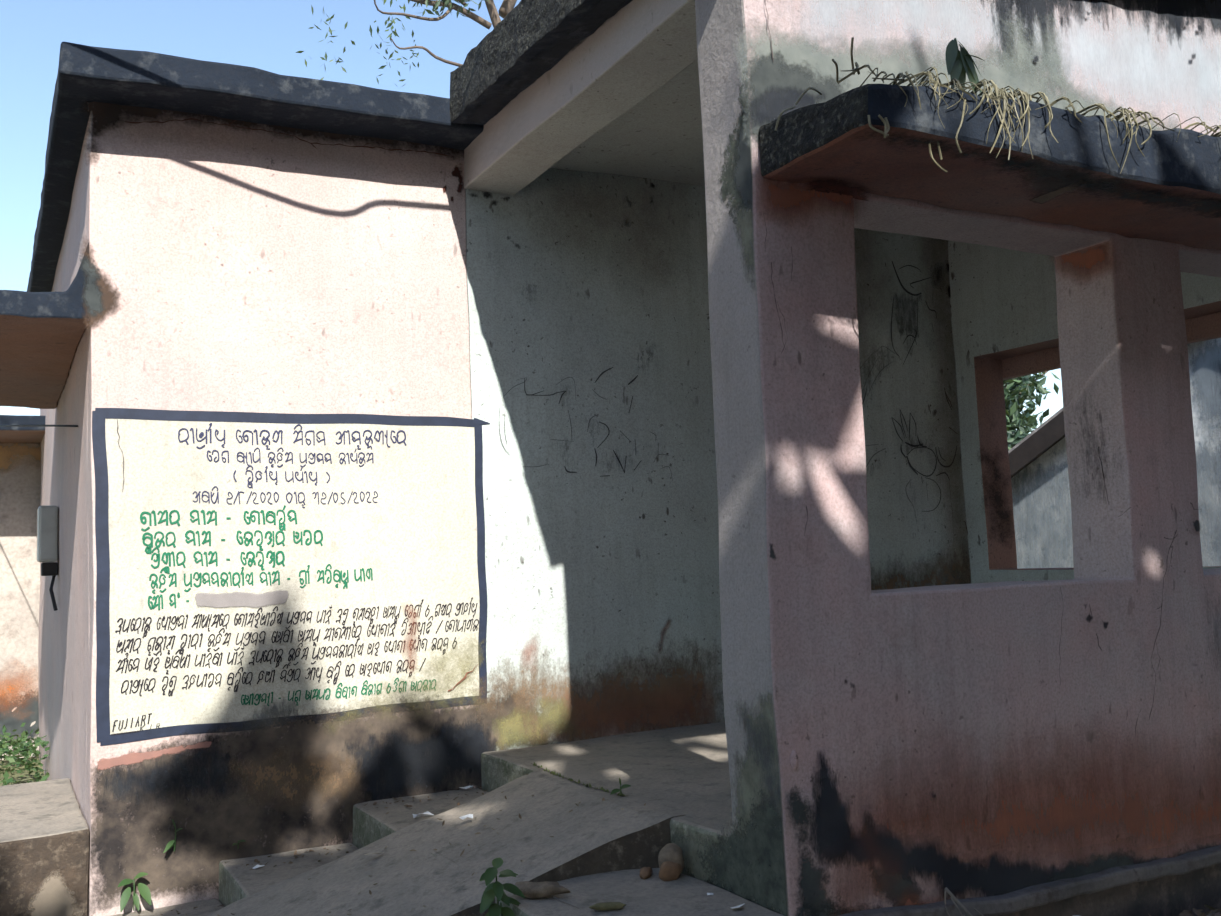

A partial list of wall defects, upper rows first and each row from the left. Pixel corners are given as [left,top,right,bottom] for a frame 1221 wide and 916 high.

water stain [740,0,1221,136]
water stain [866,133,1221,218]
water stain [735,205,754,283]
crack [1149,530,1178,718]
water stain [0,692,39,740]
water stain [90,689,549,909]
water stain [787,753,1217,916]